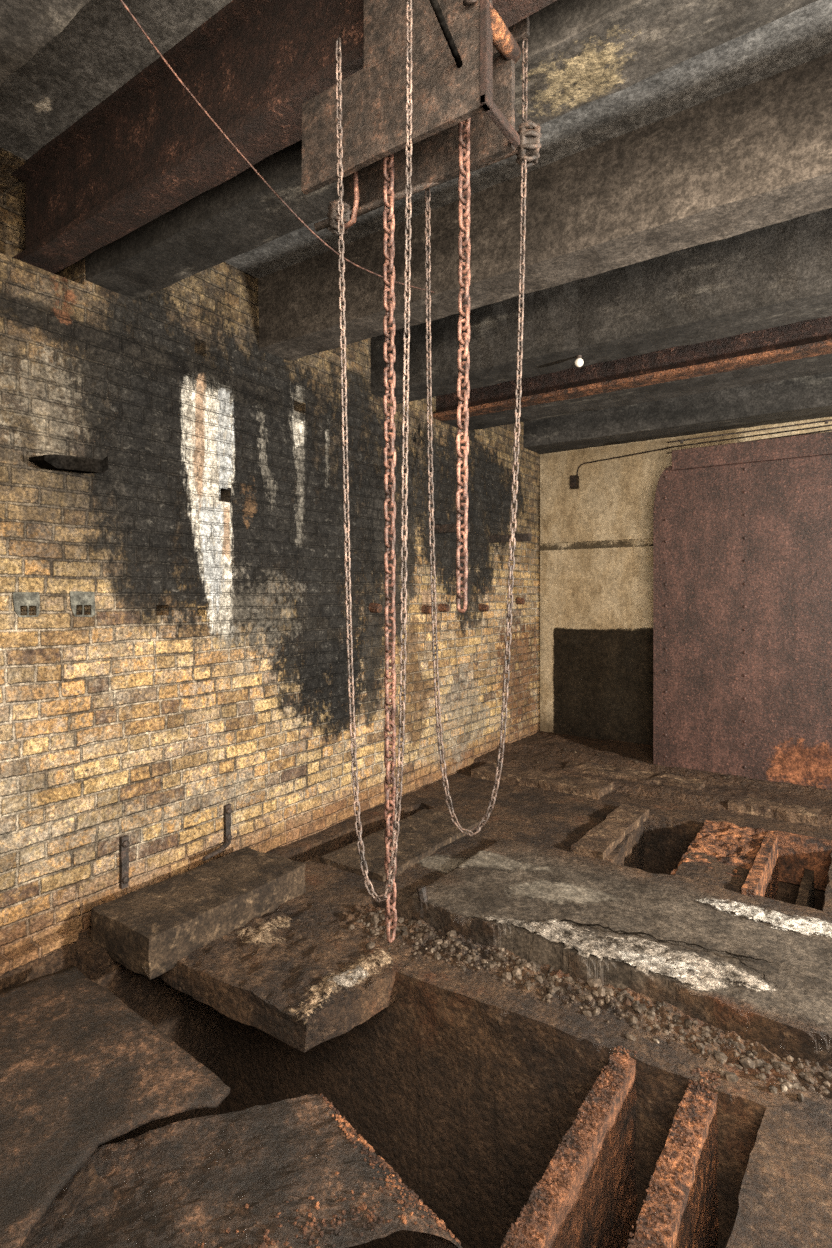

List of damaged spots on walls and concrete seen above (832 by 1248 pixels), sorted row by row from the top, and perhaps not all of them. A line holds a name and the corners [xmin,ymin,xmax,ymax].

leakage [292,416,304,448]
leakage [181,374,235,639]
rust [767,738,832,788]
leakage [698,898,832,938]
crack [560,919,782,989]